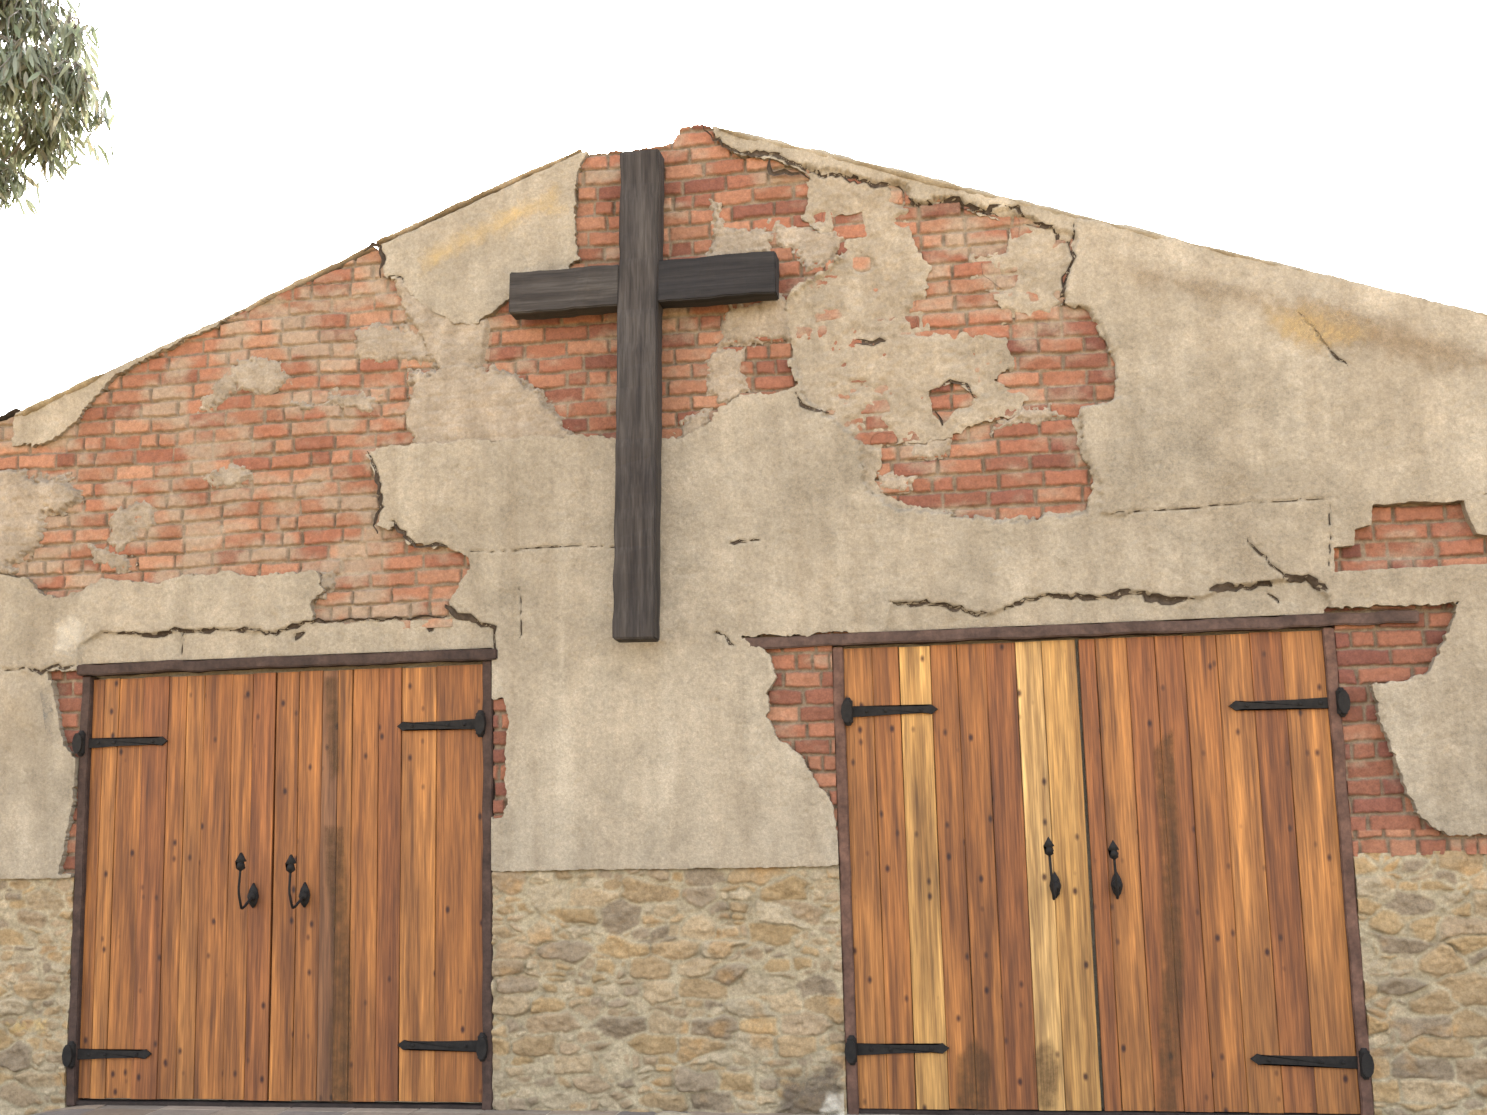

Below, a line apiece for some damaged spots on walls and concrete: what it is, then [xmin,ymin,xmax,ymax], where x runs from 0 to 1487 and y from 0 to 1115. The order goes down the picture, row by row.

spalling [571,124,1116,520]
spalling [0,250,617,641]
crack [892,498,1331,617]
spalling [1334,503,1487,572]
crack [104,598,522,653]
spalling [51,670,91,758]
spalling [743,632,848,831]
spalling [1324,603,1487,857]
spalling [63,787,78,874]